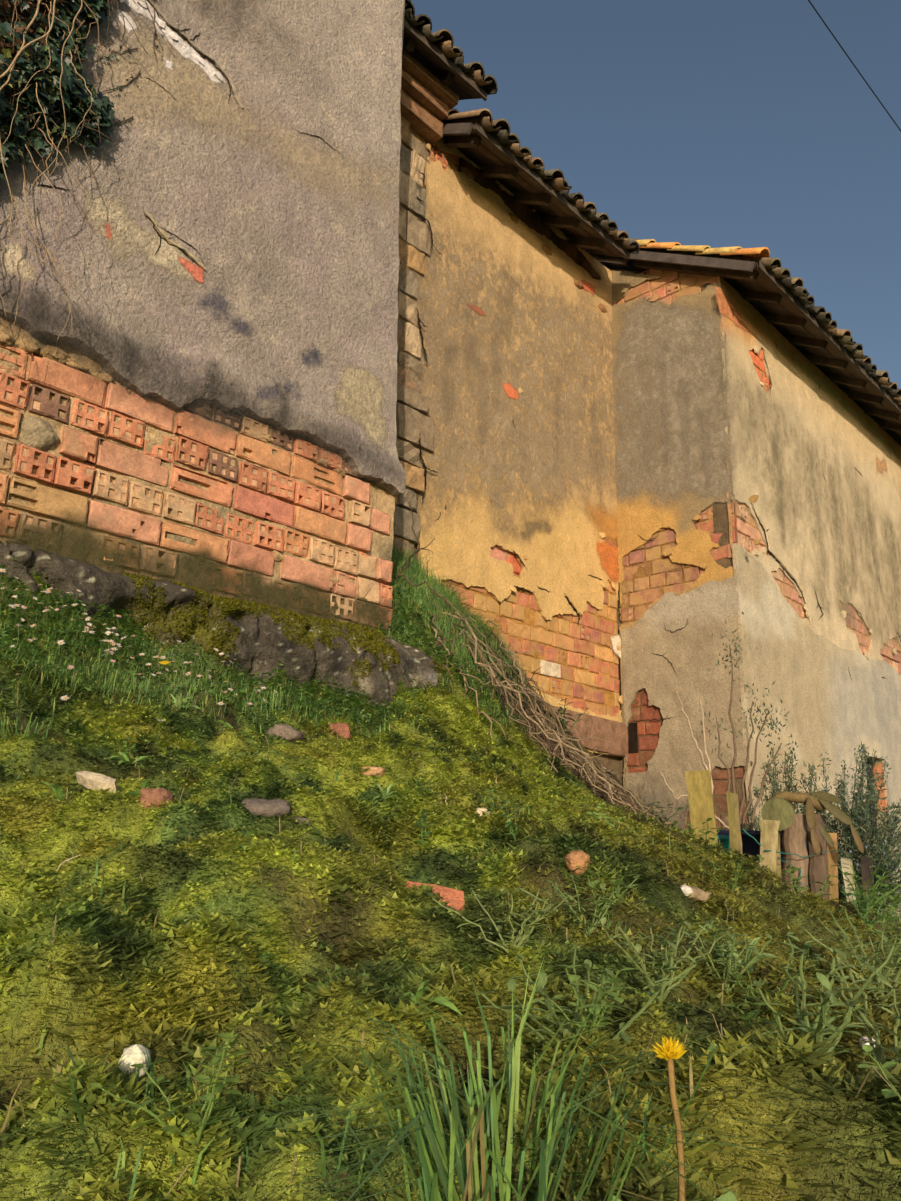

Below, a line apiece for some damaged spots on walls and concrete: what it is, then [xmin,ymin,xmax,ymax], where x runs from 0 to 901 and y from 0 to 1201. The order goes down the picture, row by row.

crack [147,0,244,108]
spalling [0,115,750,629]
spalling [749,346,770,394]
spalling [443,492,769,774]
crack [751,502,824,625]
spalling [771,569,810,619]
spalling [839,601,901,674]
spalling [711,761,766,830]